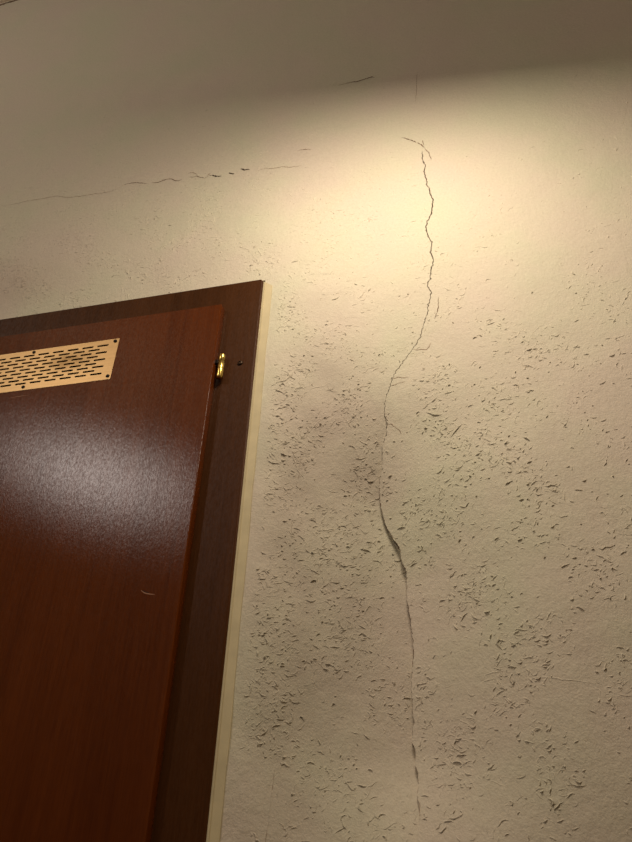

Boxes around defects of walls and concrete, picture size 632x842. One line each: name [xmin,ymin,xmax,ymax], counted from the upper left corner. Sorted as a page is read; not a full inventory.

crack [383,137,439,443]